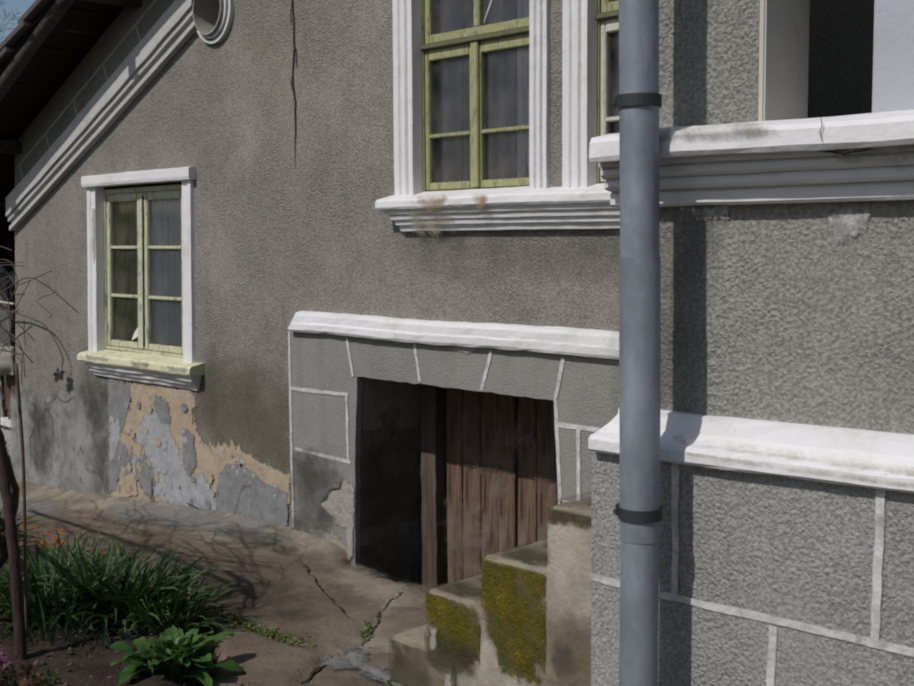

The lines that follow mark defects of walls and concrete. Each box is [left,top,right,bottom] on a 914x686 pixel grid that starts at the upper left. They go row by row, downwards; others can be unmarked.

crack [289,0,297,151]
leakage [10,386,337,564]
peeling [107,377,291,511]
flaking render [308,478,355,564]
crack [301,665,323,685]
crack [302,563,413,669]
leakage [330,533,425,615]
leakage [353,625,408,653]
leakage [411,629,436,675]